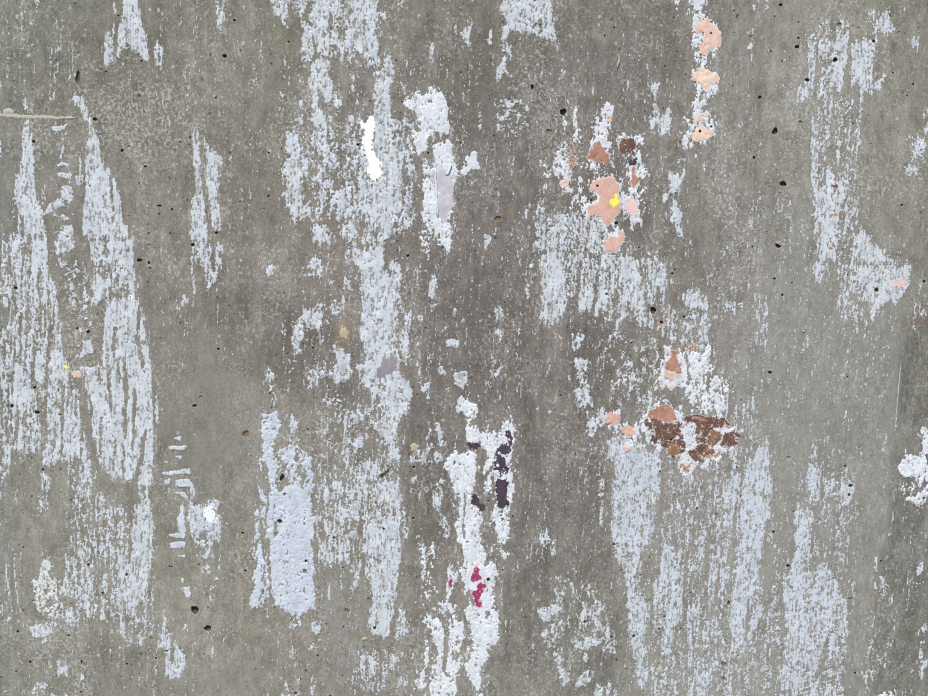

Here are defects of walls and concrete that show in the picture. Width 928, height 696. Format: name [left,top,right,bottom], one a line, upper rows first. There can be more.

peeling [0,0,281,696]
peeling [248,0,928,696]